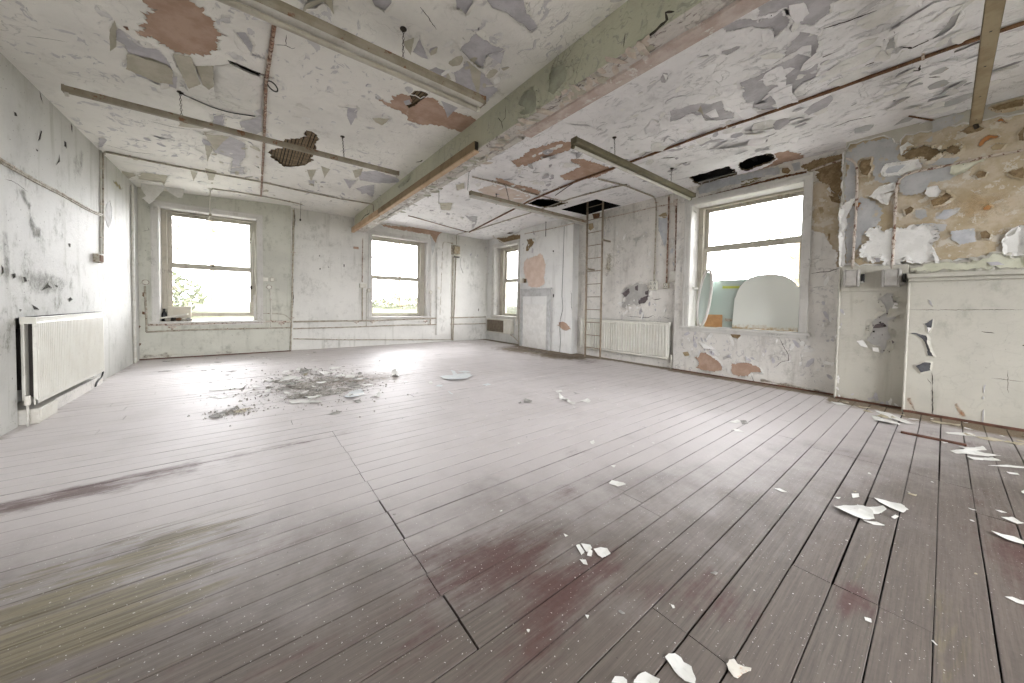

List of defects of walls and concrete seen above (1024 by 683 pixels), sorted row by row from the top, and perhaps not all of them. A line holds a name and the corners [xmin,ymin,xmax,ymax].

flaking render [109,0,330,196]
flaking render [337,93,476,132]
peeling [564,0,1024,286]
flaking render [330,140,615,288]
peeling [617,280,666,319]
flaking render [681,301,854,397]
peeling [857,291,937,374]